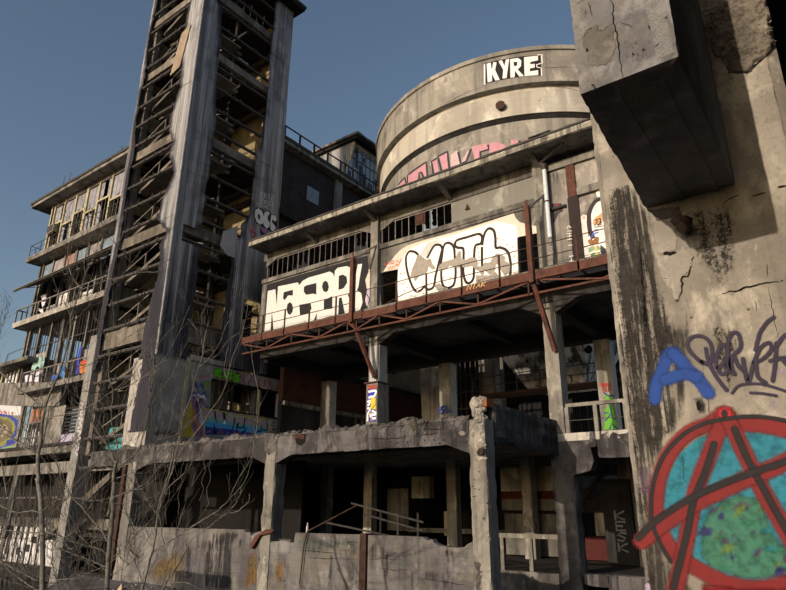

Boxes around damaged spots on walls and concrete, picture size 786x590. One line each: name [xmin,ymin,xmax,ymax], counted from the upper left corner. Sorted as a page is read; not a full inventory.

peeling [582,22,632,67]
crack [610,0,623,76]
spalling [699,0,776,74]
spalling [648,206,694,301]
water stain [689,207,734,282]
crack [723,266,783,338]
water stain [609,186,688,530]
spalling [459,421,487,461]
water stain [204,533,241,589]
water stain [642,540,671,590]